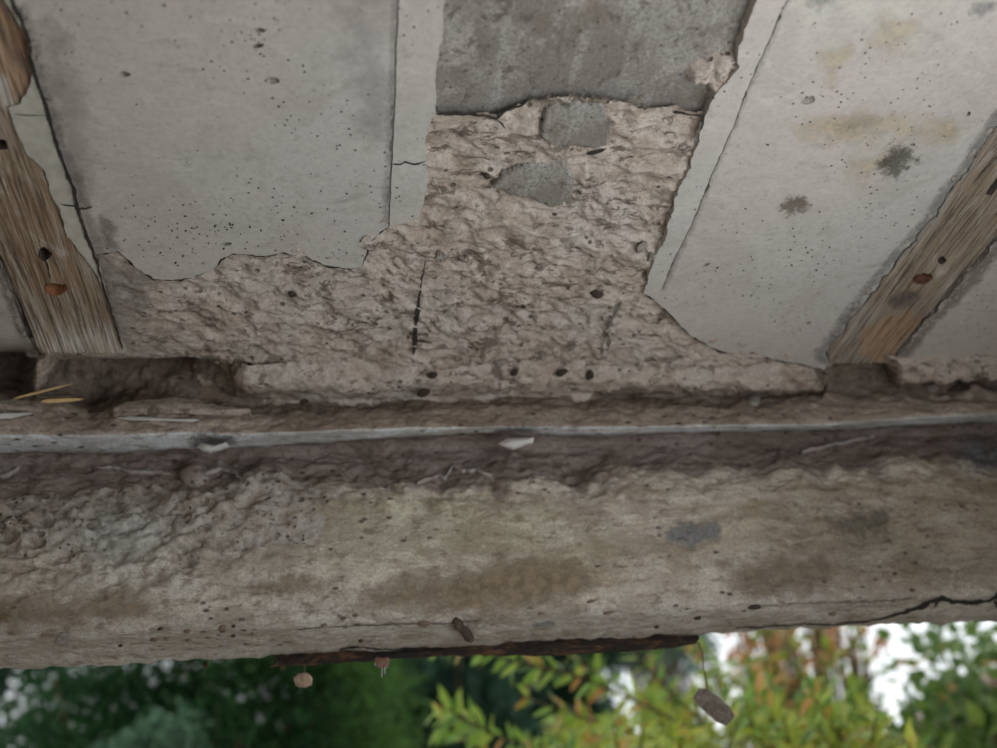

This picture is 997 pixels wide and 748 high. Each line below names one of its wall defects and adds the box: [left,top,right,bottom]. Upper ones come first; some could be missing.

crack [10,0,426,350]
spalling [49,96,799,369]
water stain [780,197,812,213]
water stain [878,145,920,178]
crack [412,262,432,356]
crack [735,592,997,629]